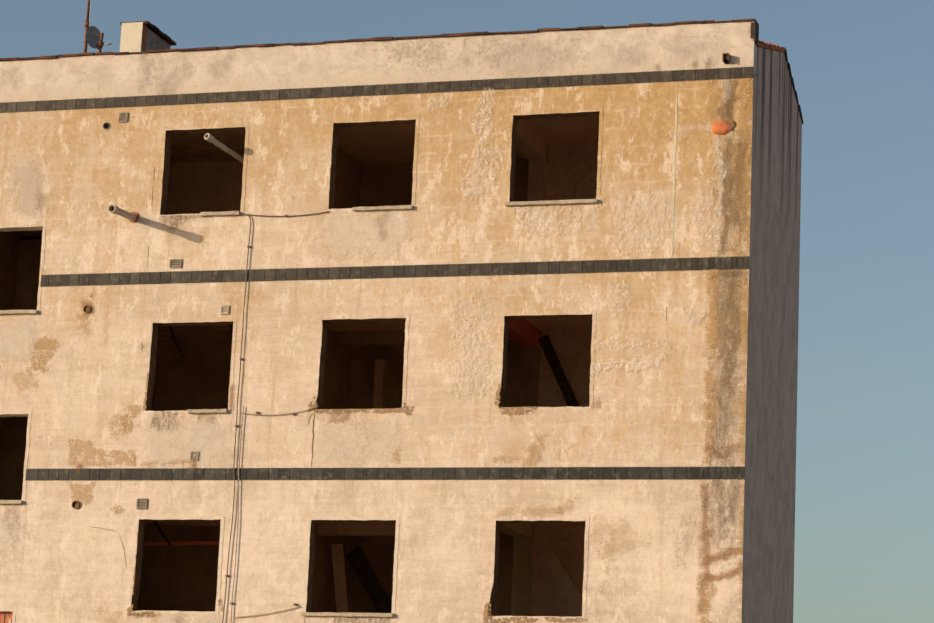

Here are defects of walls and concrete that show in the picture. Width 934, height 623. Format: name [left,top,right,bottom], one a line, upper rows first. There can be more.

leakage [695,78,753,257]
peeling [31,337,56,373]
spalling [308,396,414,416]
corrosion [703,266,720,463]
leakage [738,277,749,464]
peeling [68,441,136,466]
spalling [483,603,587,623]
corrosion [698,548,743,623]